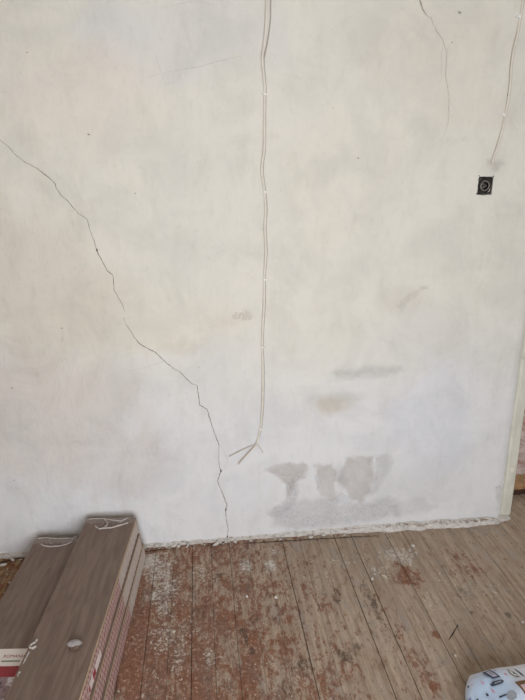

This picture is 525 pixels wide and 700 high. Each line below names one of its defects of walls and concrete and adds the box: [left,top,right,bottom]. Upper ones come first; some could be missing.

crack [419,0,449,146]
crack [0,140,229,537]